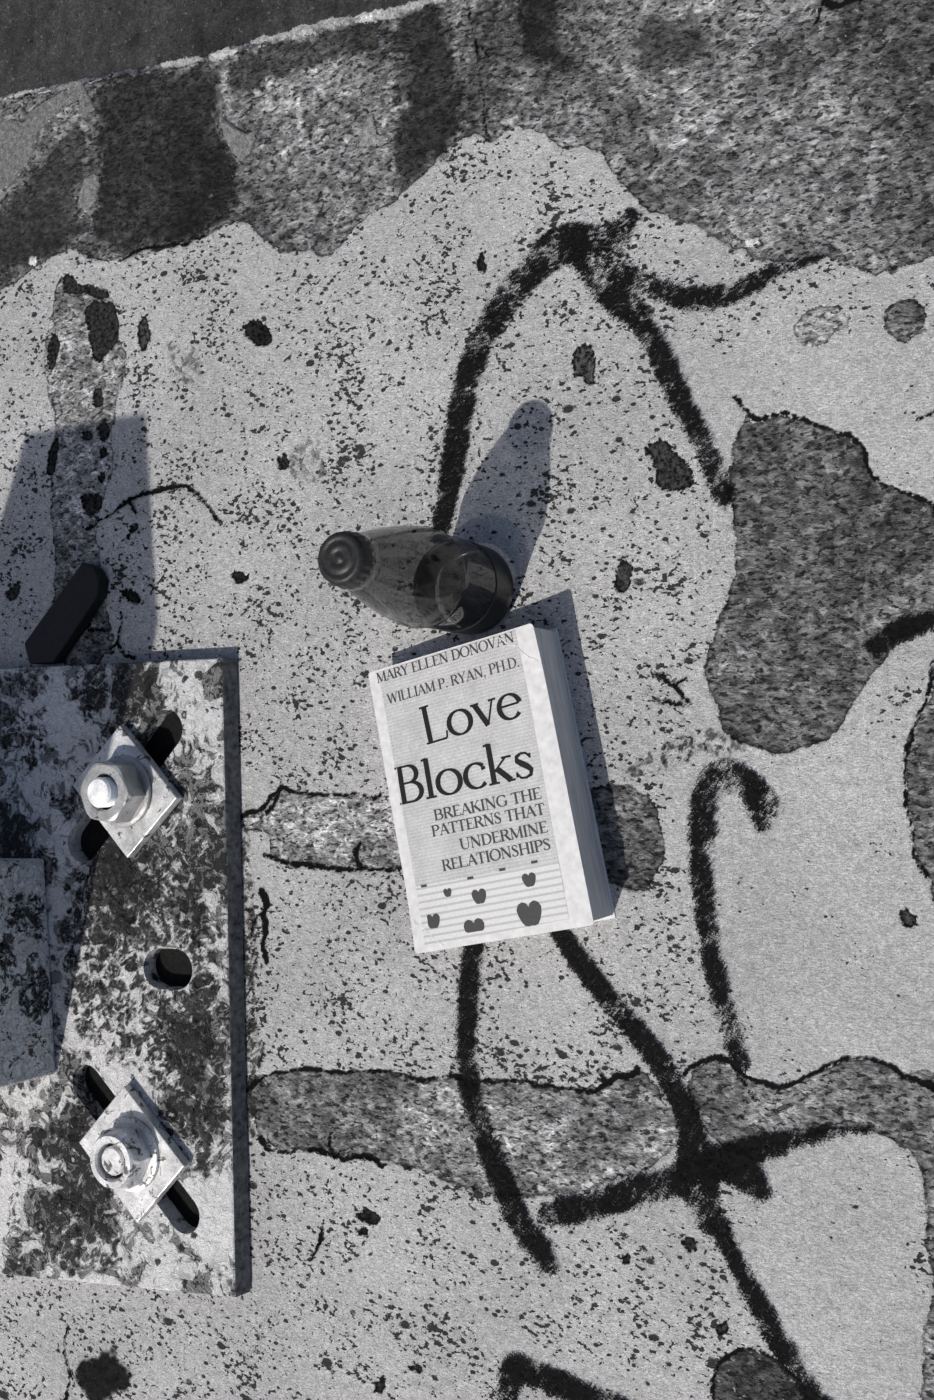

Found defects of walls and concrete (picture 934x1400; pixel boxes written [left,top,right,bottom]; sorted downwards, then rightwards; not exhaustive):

spalling [0,0,934,290]
spalling [242,319,272,346]
spalling [882,299,927,343]
spalling [44,273,151,605]
crack [85,484,222,531]
spalling [644,437,694,492]
spalling [703,415,934,756]
crack [240,785,381,819]
spalling [240,790,402,872]
spalling [590,782,666,892]
spalling [248,1068,683,1199]
spalling [686,1059,934,1400]